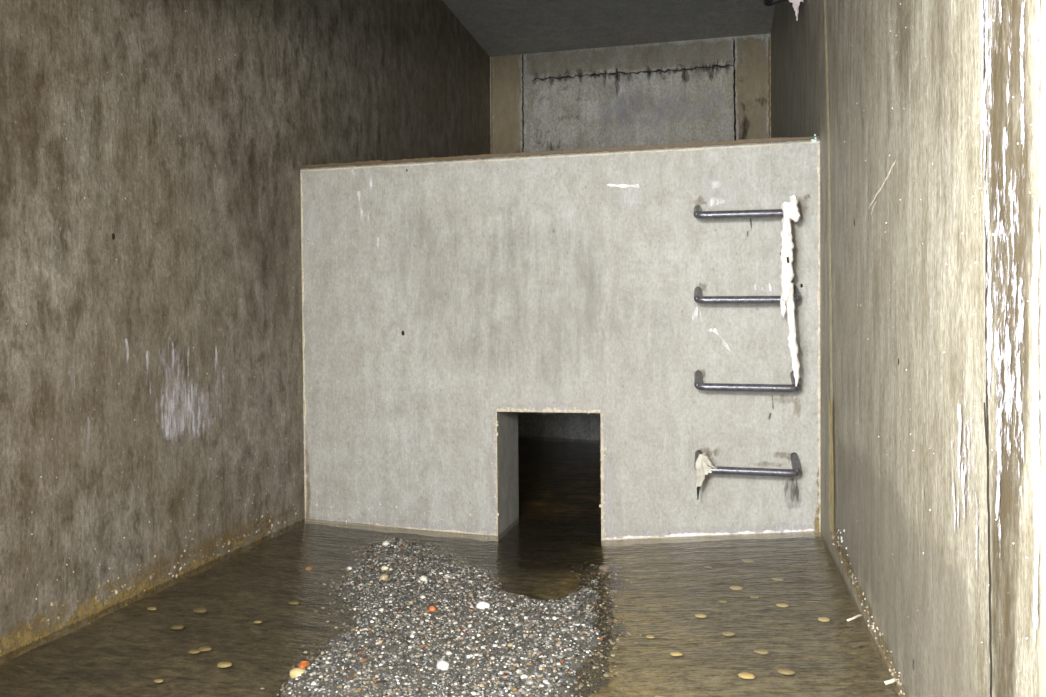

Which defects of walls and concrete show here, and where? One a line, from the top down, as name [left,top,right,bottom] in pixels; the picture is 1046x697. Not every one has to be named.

water stain [0,38,821,658]
water stain [980,0,1046,697]